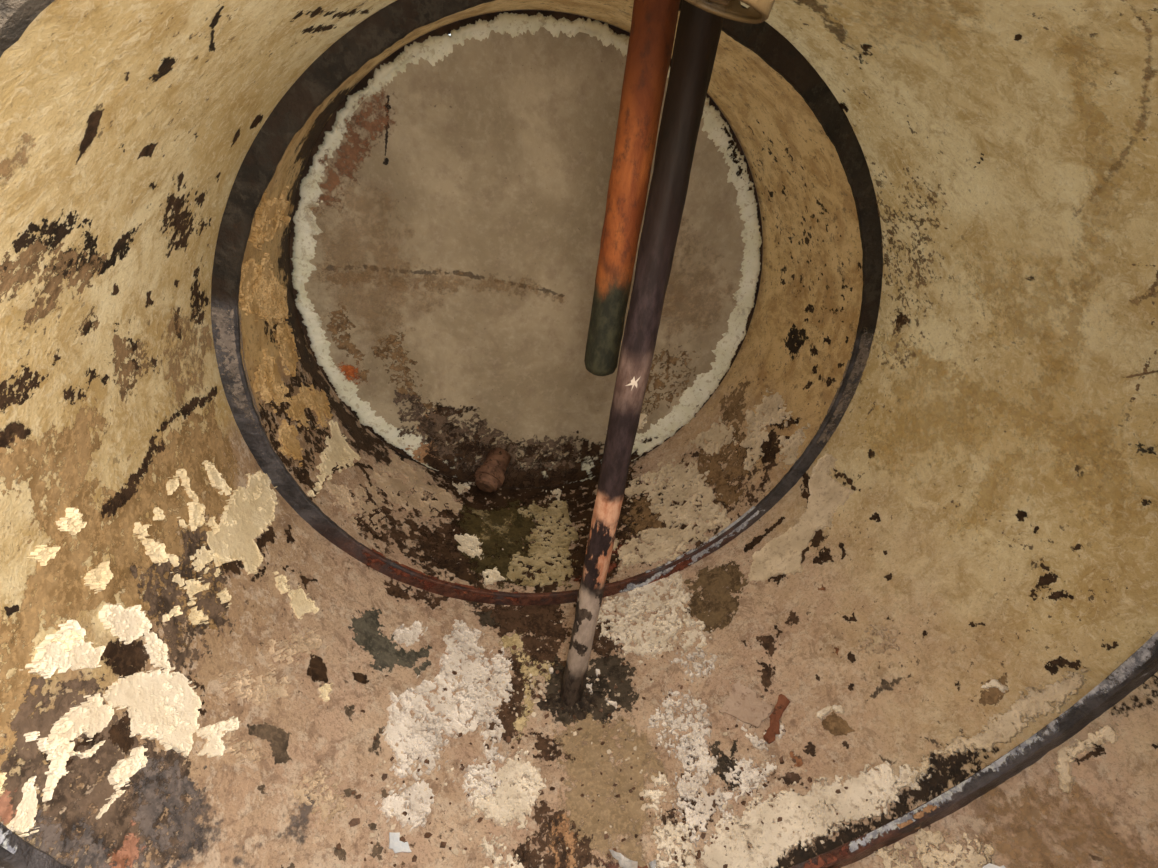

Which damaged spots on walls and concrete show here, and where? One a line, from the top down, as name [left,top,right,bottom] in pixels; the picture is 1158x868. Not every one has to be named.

spalling [1,209,136,282]
leakage [257,82,675,868]
leakage [605,376,800,633]
corrosion [648,553,693,584]
peeling [6,460,278,838]
leakage [743,611,799,692]
peeling [596,388,1091,868]
peeling [374,619,547,868]
leakage [709,738,741,791]
corrosion [0,787,18,824]
corrosion [104,820,146,868]
corrosion [547,811,579,868]